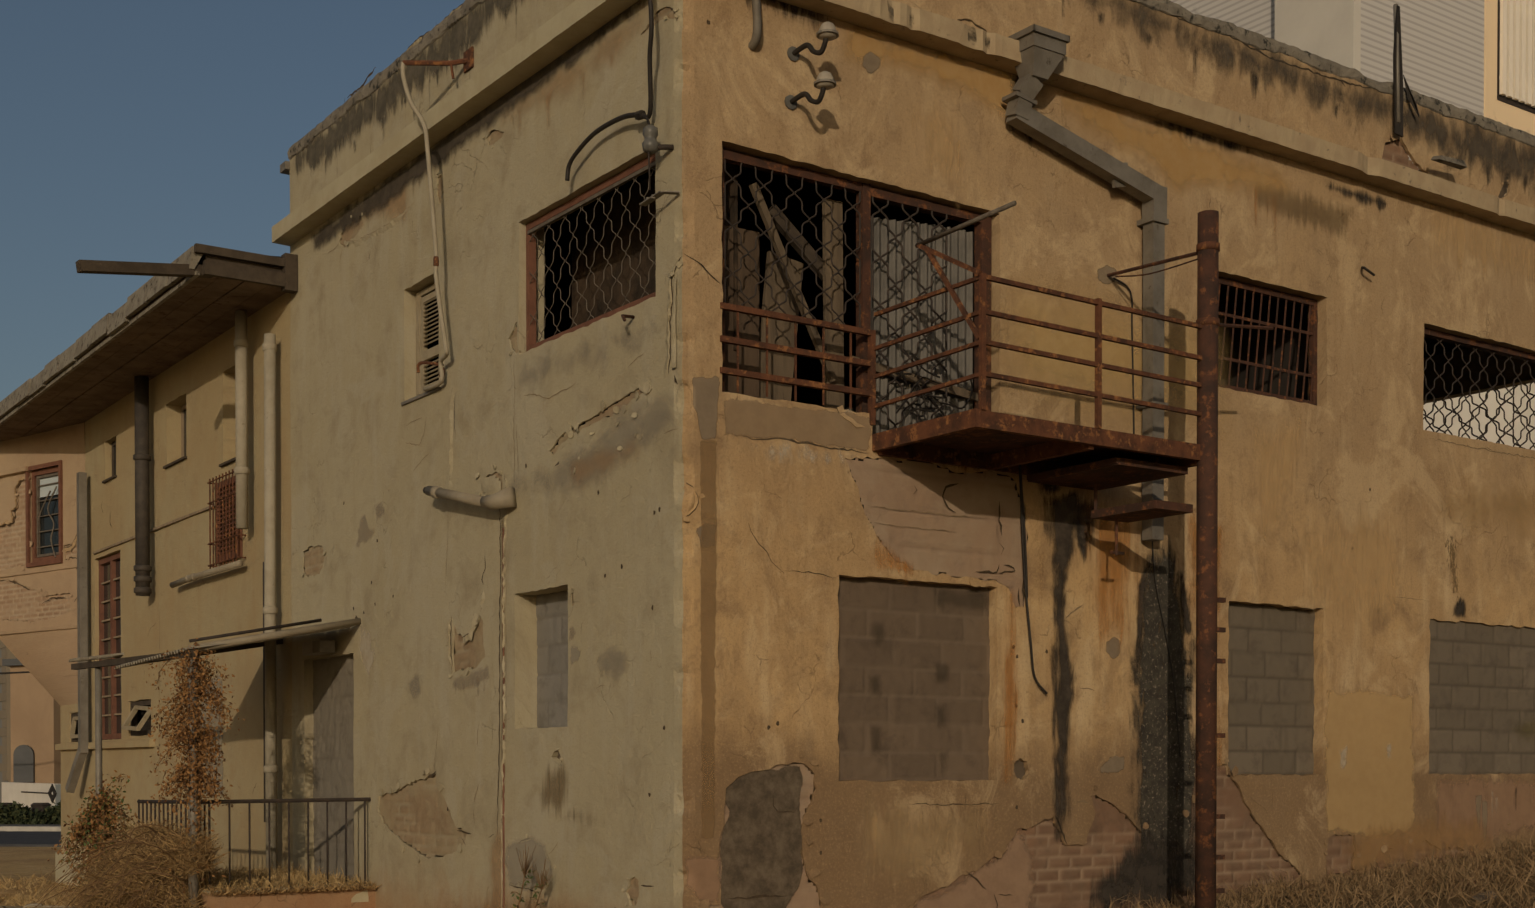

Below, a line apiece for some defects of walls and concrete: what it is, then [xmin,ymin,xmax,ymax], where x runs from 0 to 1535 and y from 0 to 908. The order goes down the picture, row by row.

mould [296,0,642,248]
water stain [1082,0,1535,188]
water stain [1329,184,1386,210]
spalling [0,476,72,621]
crack [749,526,832,578]
crack [867,483,1025,606]
spalling [448,619,485,678]
water stain [1041,483,1094,838]
water stain [1090,545,1196,908]
spalling [699,751,832,908]
spalling [913,784,1195,908]
spalling [1216,757,1307,899]